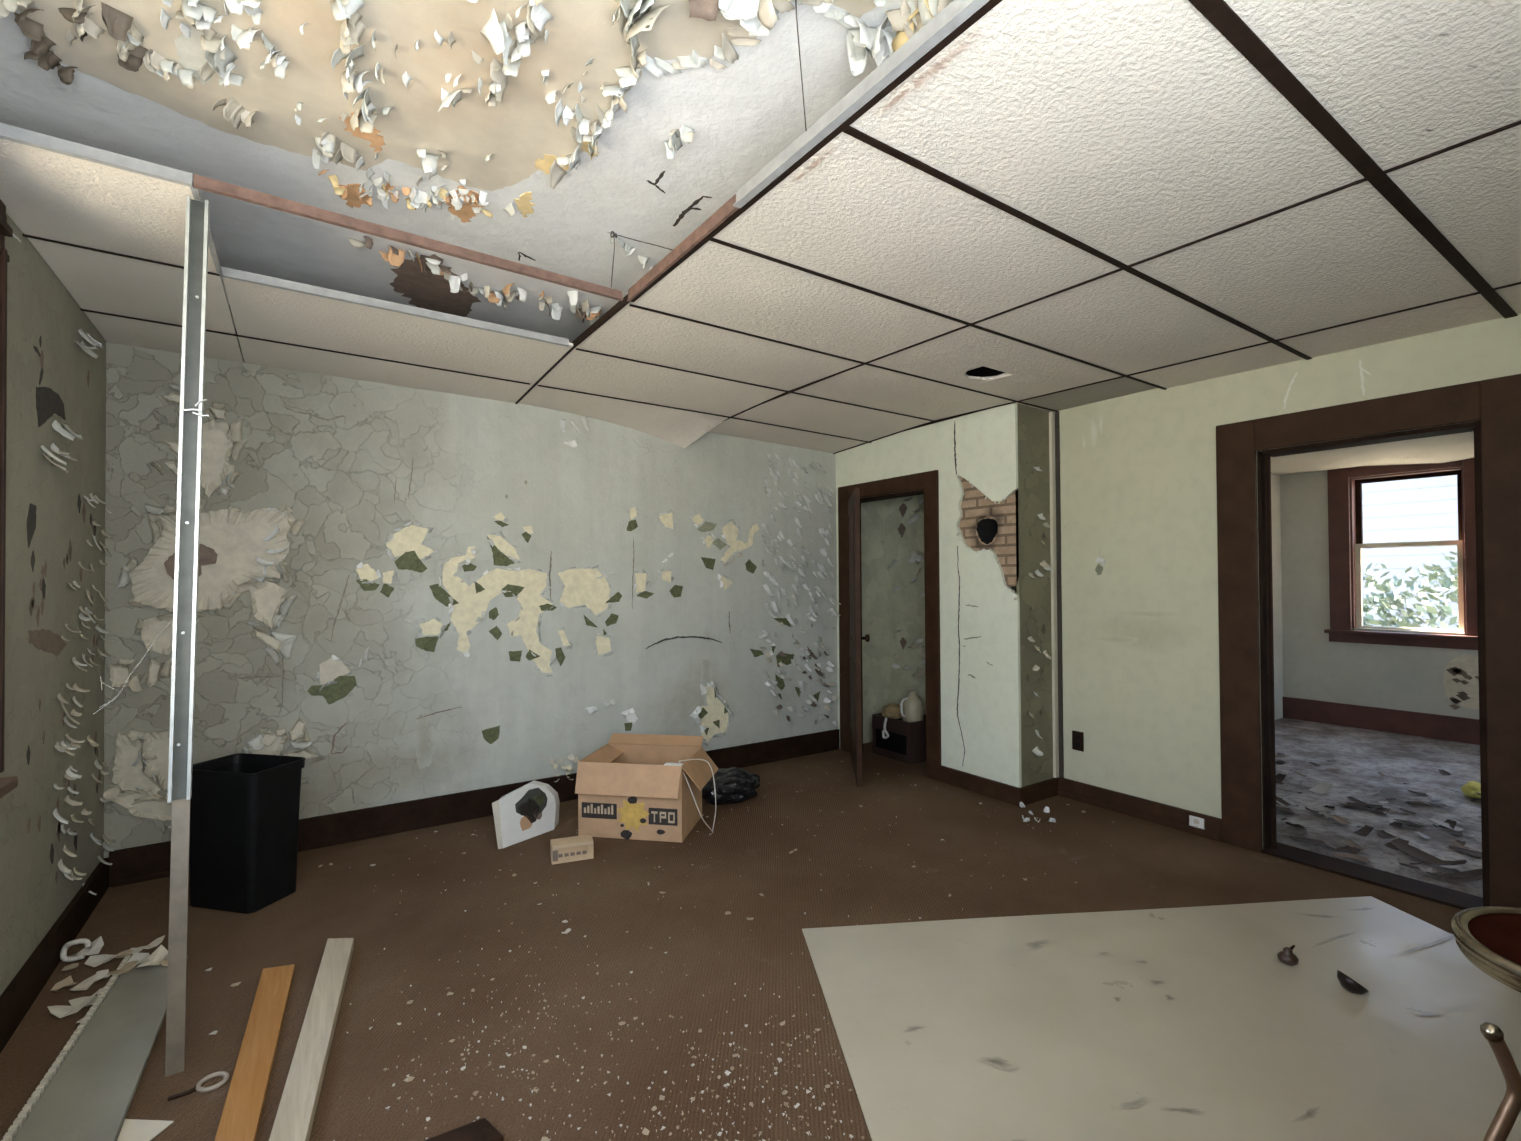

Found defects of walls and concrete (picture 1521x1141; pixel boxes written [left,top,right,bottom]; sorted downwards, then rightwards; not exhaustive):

peeling [0,0,953,223]
peeling [36,387,83,473]
peeling [74,329,103,387]
peeling [349,236,603,325]
peeling [26,440,179,895]
peeling [197,402,306,665]
peeling [241,718,326,764]
peeling [353,494,683,676]
flaking render [956,475,1053,756]